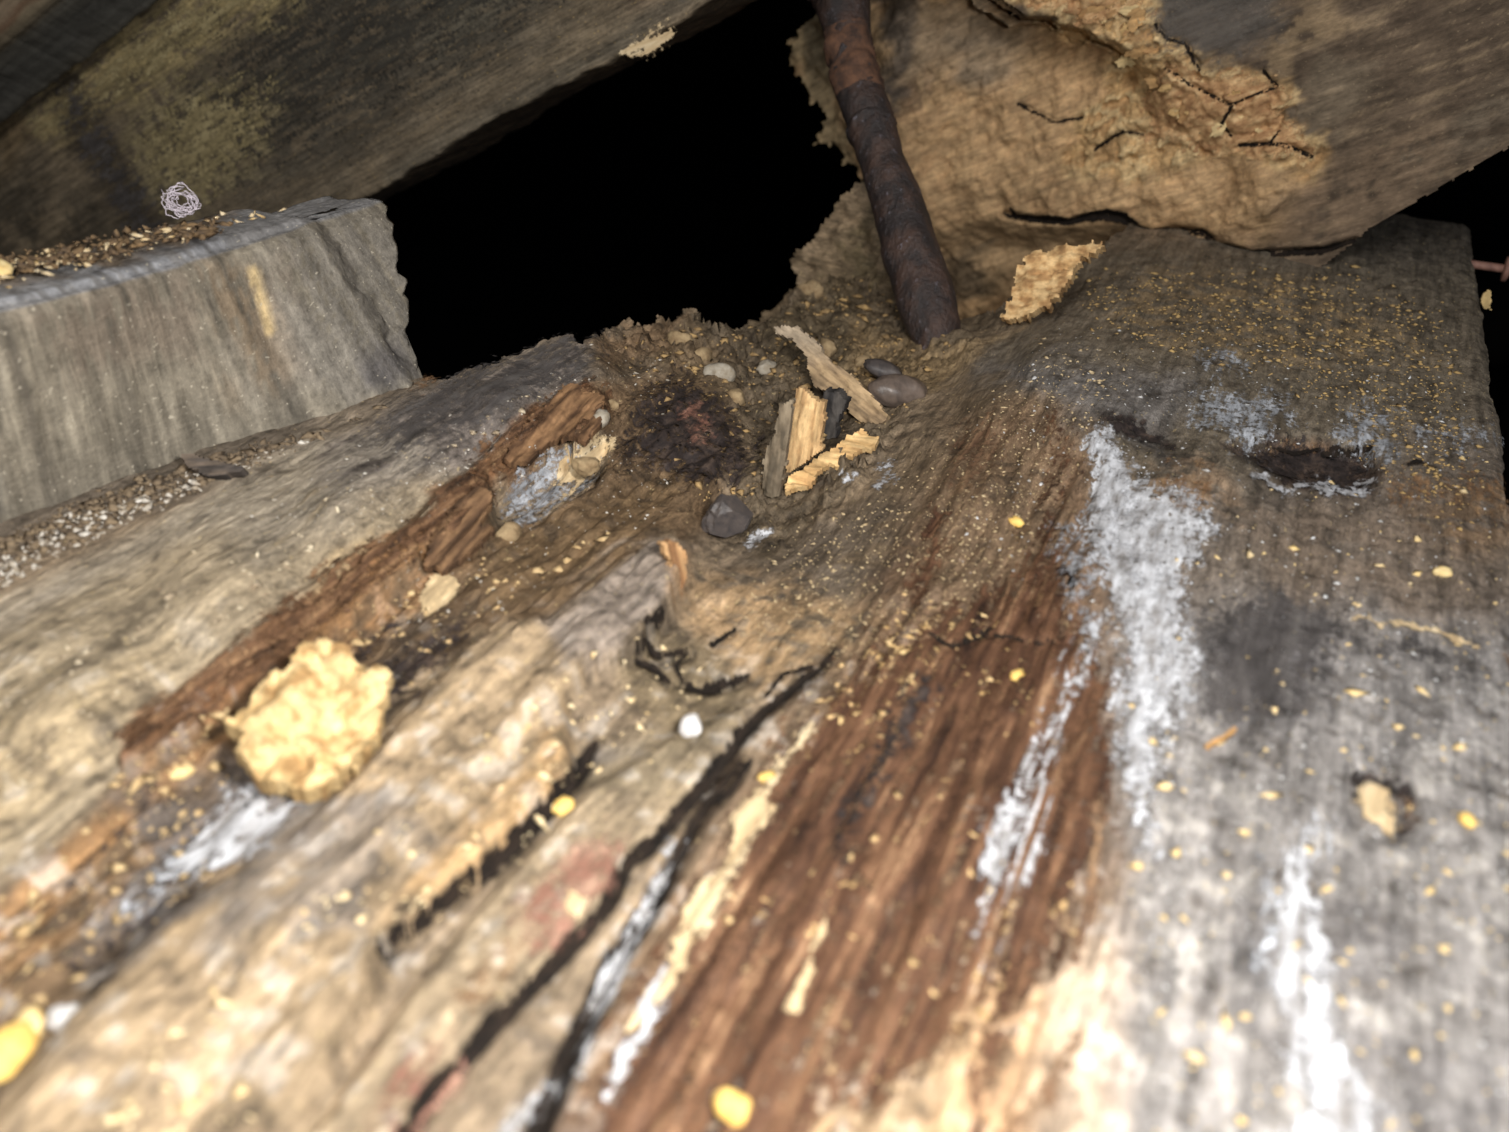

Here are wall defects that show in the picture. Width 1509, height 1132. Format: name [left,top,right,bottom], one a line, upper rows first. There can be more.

crack [1017,102,1144,151]
crack [1153,23,1314,158]
leakage [1186,350,1298,455]
leakage [1250,398,1504,498]
leakage [969,424,1448,1132]
crack [373,605,837,1132]